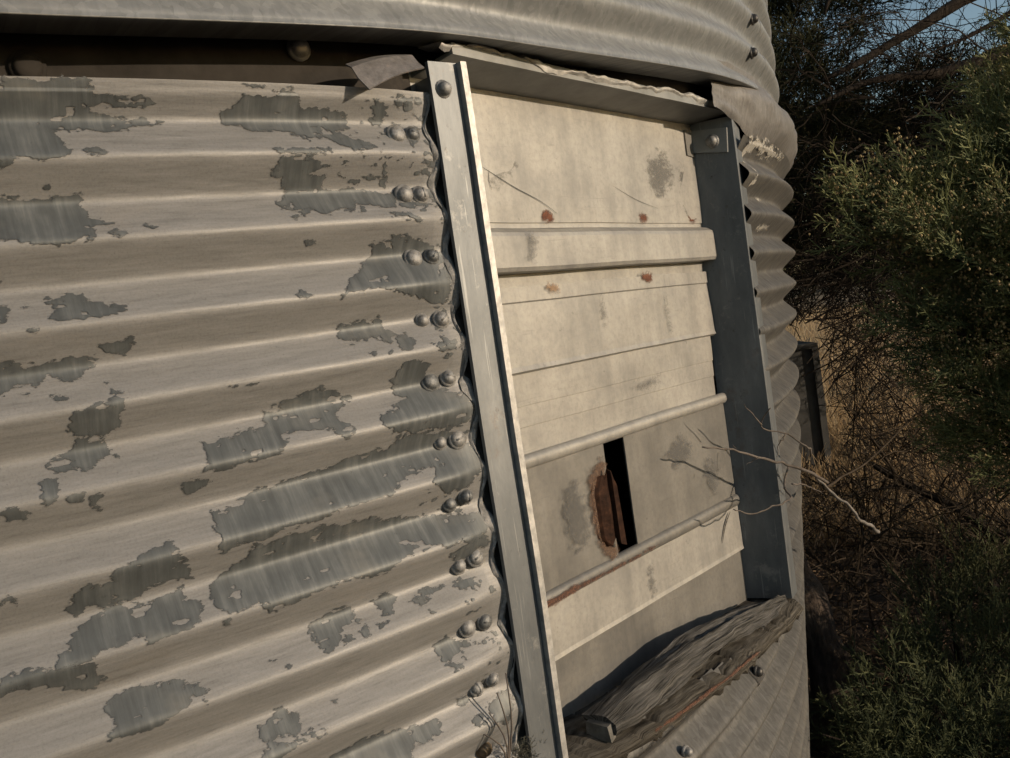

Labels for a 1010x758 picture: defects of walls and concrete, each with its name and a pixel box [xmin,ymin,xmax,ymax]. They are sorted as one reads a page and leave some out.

peeling [0,75,165,169]
peeling [219,83,445,224]
leakage [650,159,683,196]
peeling [0,183,128,246]
peeling [44,292,128,321]
peeling [340,233,462,359]
peeling [0,315,497,698]
corrosion [547,462,655,608]
peeling [103,679,211,742]
peeling [257,706,328,758]
peeling [329,718,442,758]
peeling [472,676,516,728]